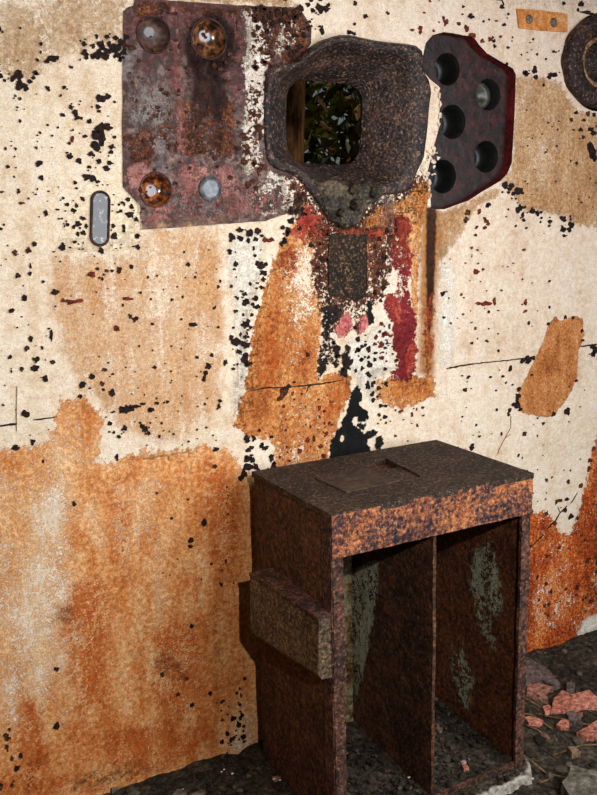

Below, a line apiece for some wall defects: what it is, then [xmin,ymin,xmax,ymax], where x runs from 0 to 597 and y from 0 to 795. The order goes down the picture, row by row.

peeling [433,4,514,49]
peeling [0,42,59,123]
corrosion [122,1,309,179]
peeling [17,0,425,481]
peeling [501,180,575,237]
peeling [8,328,56,382]
crack [252,380,342,392]
corrosion [234,170,440,467]
crack [447,357,534,369]
peeling [489,355,535,417]
corrosion [527,435,597,653]
corrosion [0,395,263,795]